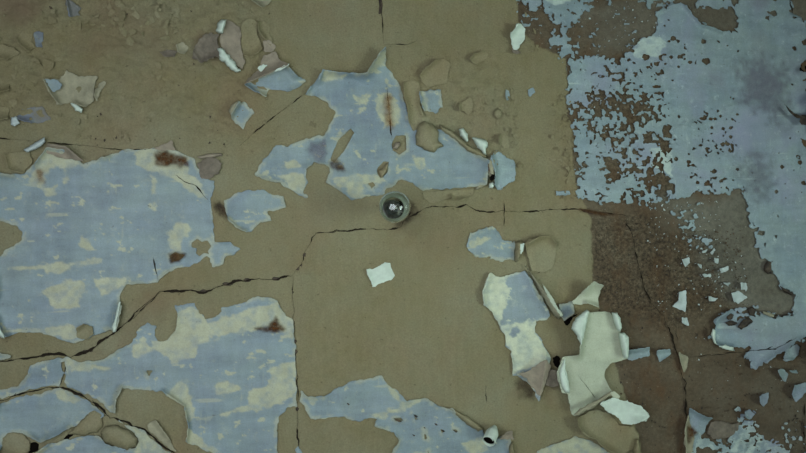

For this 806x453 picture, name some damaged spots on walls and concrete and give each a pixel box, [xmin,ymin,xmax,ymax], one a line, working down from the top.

peeling [160,19,245,72]
crack [378,0,413,45]
peeling [43,70,106,113]
rust [155,151,188,166]
peeling [224,40,516,232]
peeling [0,137,240,343]
peeling [510,0,806,453]
peeling [367,262,395,287]
rust [258,319,284,332]
crack [0,204,687,453]
crack [699,337,806,357]
peeling [0,296,514,453]